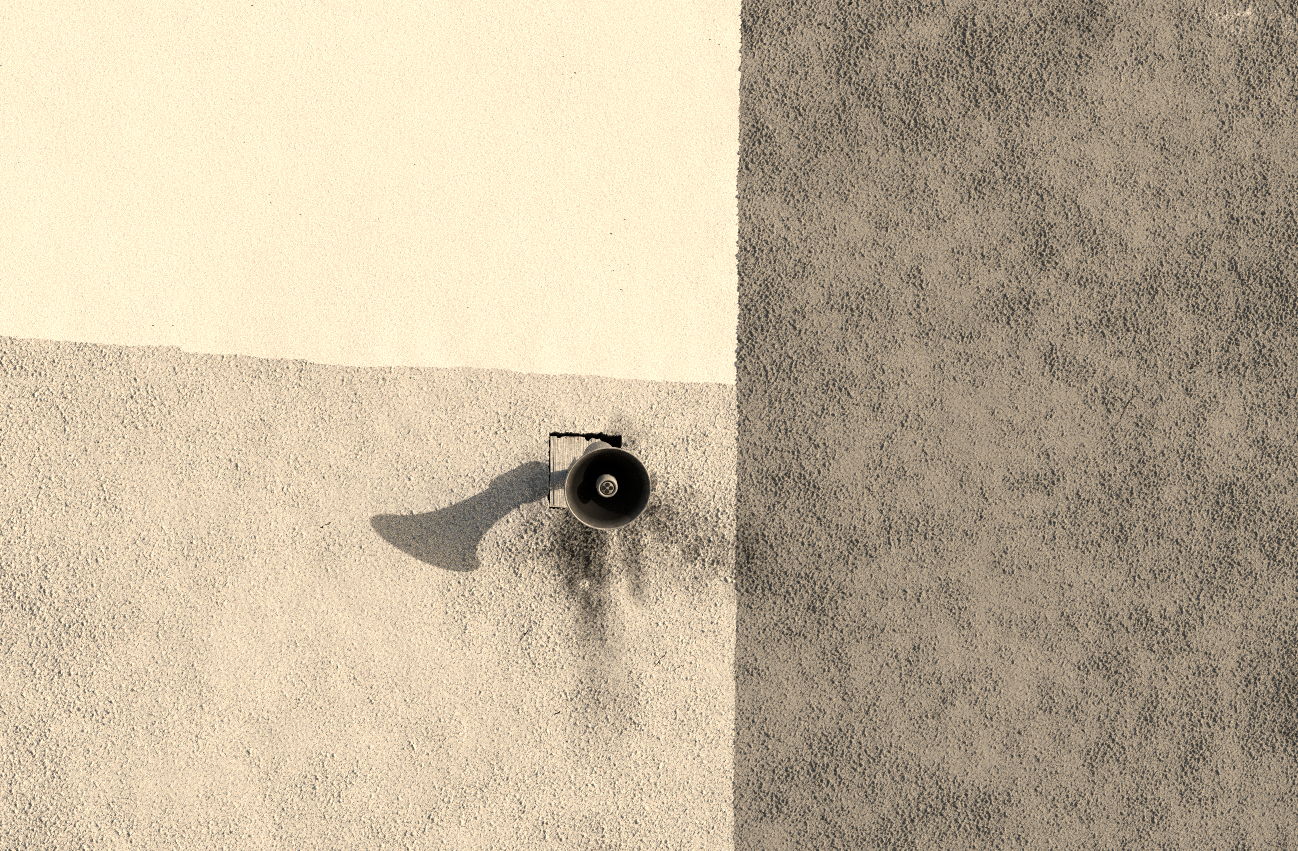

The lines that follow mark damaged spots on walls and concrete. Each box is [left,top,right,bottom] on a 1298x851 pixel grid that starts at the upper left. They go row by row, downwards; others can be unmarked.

leakage [563,508,606,616]